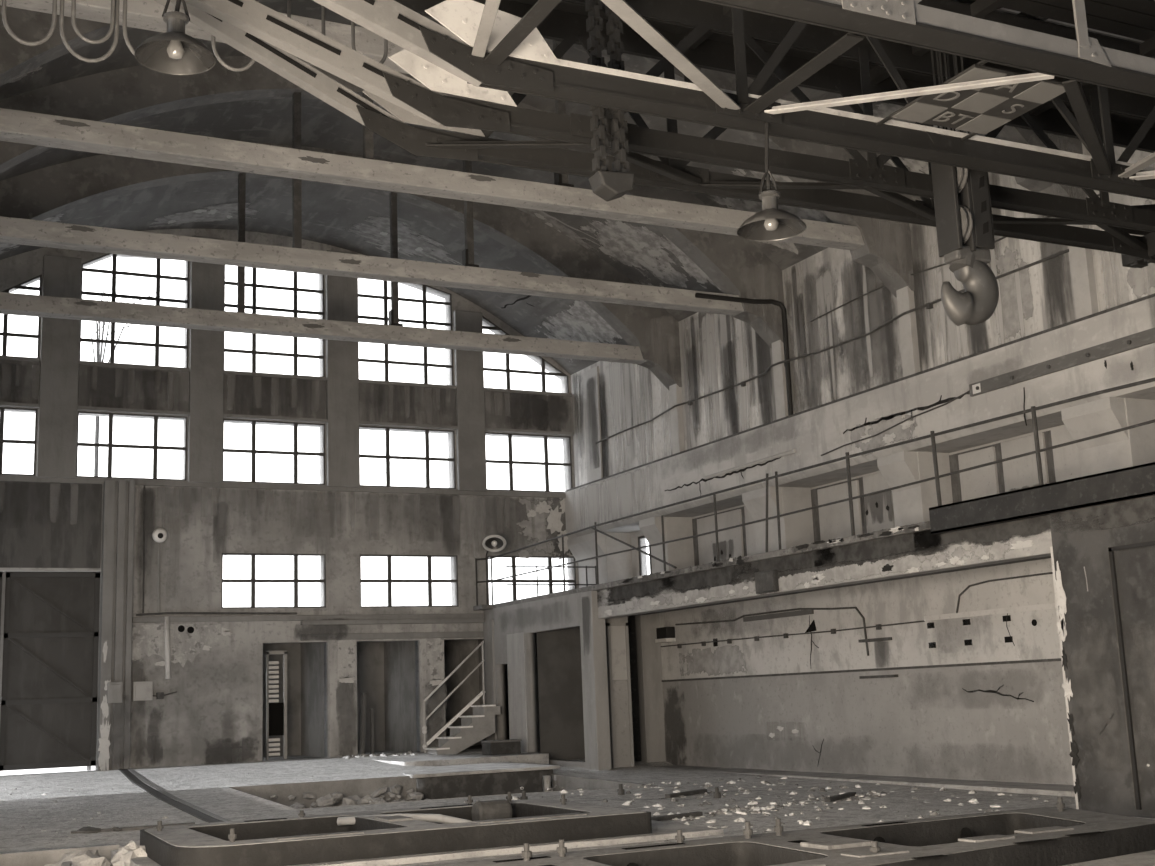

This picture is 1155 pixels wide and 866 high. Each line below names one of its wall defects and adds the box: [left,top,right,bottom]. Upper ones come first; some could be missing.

water stain [685,313,770,439]
water stain [786,262,902,411]
water stain [911,225,1033,361]
water stain [1044,243,1064,315]
peeling [516,497,571,559]
peeling [604,540,1033,615]
crack [962,684,1034,702]
spalling [1055,561,1081,802]